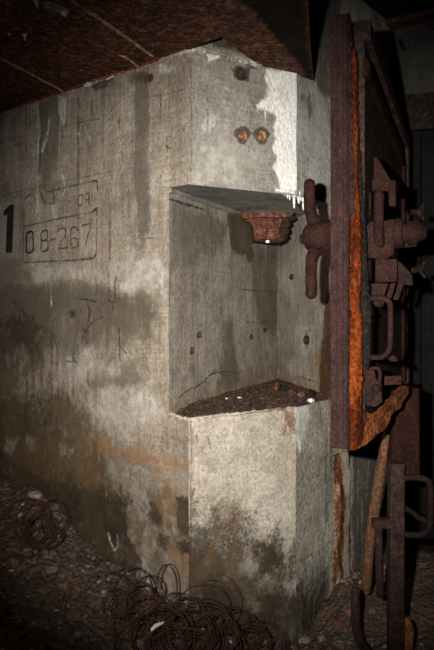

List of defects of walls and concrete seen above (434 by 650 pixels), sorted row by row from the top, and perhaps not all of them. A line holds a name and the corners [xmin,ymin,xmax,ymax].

water stain [134,73,150,155]
efflorescence [257,68,302,202]
water stain [135,167,149,232]
water stain [0,259,165,441]
water stain [27,471,151,592]
water stain [140,501,161,525]
water stain [159,497,329,641]